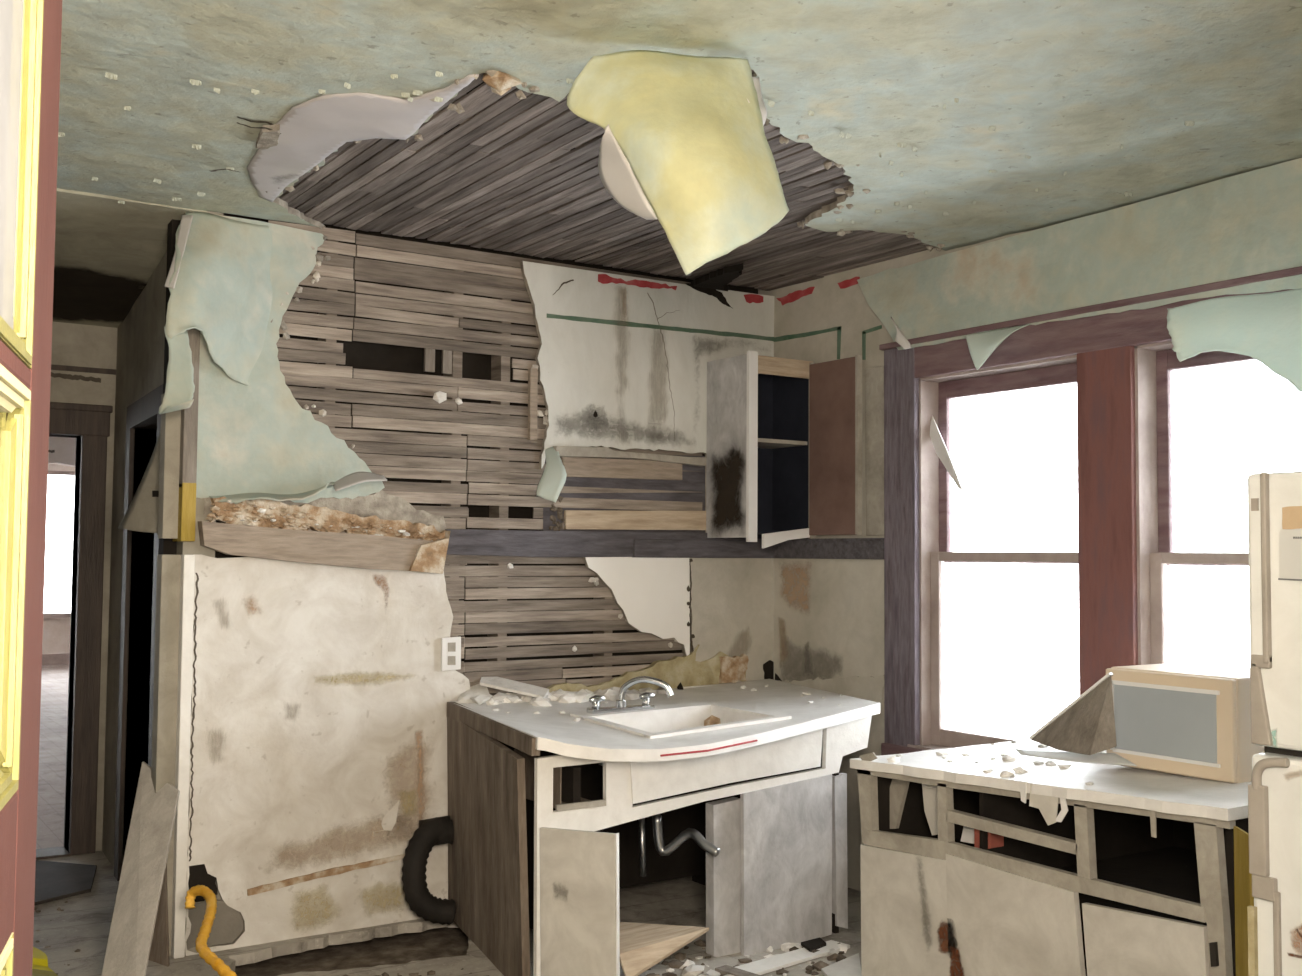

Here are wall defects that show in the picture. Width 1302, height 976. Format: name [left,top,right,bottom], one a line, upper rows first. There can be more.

leakage [53,266,147,322]
flaking render [205,70,945,541]
flaking render [444,554,884,707]
spalling [187,864,243,950]
peeling [247,854,405,896]
corrosion [937,922,964,976]